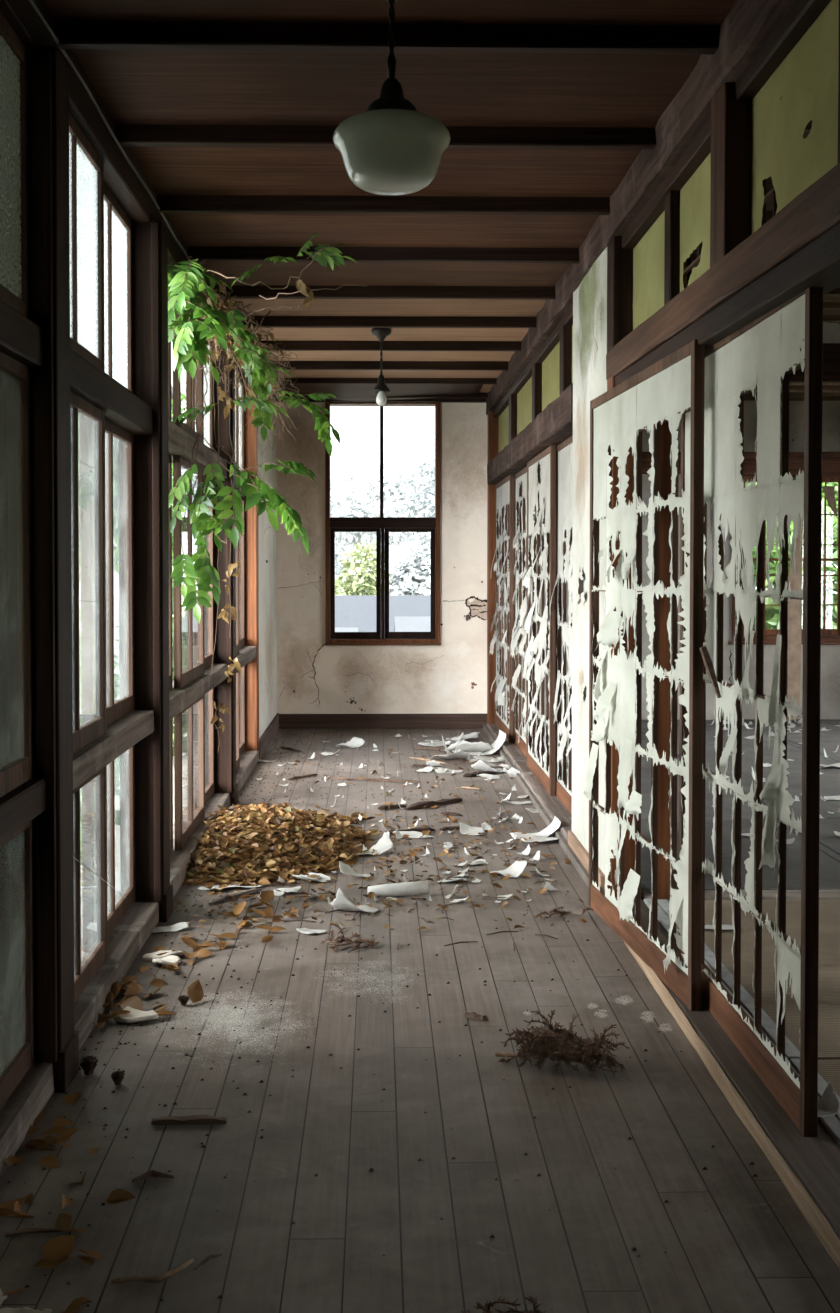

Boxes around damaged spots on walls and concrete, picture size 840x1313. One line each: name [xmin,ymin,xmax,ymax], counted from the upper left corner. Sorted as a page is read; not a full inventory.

spalling [464,581,487,622]
crack [279,644,324,705]